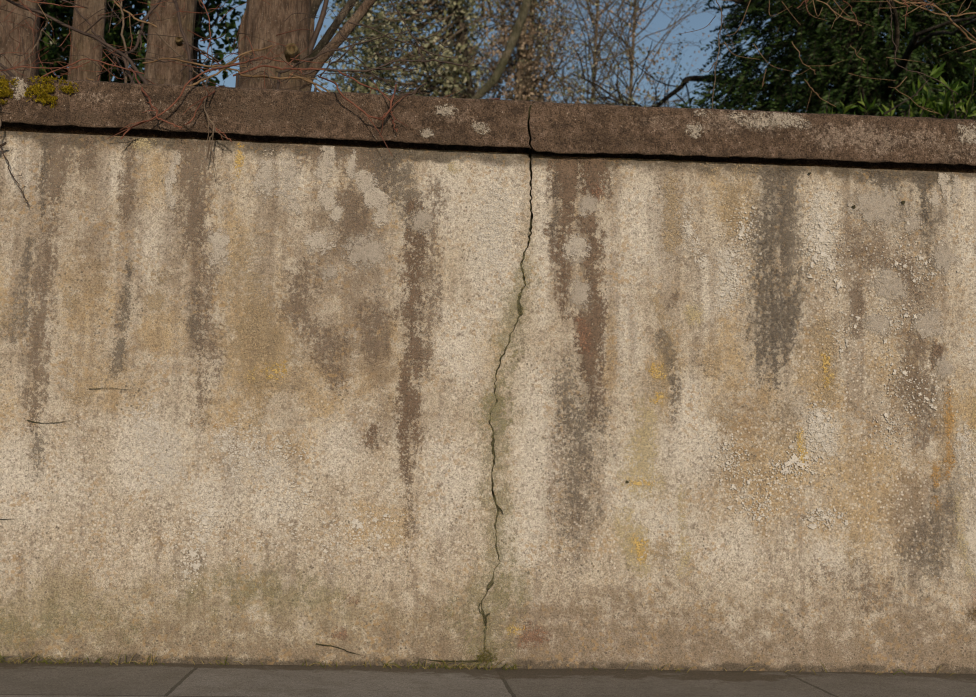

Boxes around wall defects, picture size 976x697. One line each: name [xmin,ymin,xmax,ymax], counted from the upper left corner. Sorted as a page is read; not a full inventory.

damp [5,134,97,482]
damp [109,260,134,378]
damp [117,137,139,224]
damp [166,139,228,424]
damp [273,144,452,564]
crack [426,105,533,664]
damp [742,164,810,404]
damp [848,278,868,340]
damp [844,169,941,306]
damp [888,324,946,450]
damp [809,448,962,620]